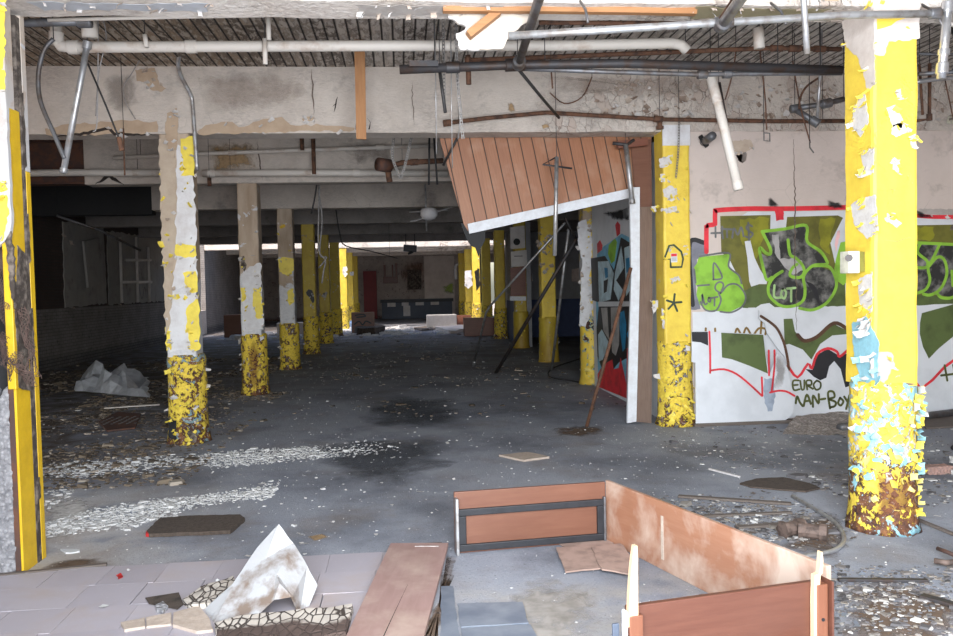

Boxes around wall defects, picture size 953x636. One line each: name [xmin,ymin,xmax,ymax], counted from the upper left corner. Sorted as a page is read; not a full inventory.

peeling [158,108,198,353]
peeling [651,155,692,226]
peeling [847,194,902,241]
peeling [238,257,288,371]
peeling [650,295,668,329]
peeling [164,369,210,446]
peeling [848,272,929,528]